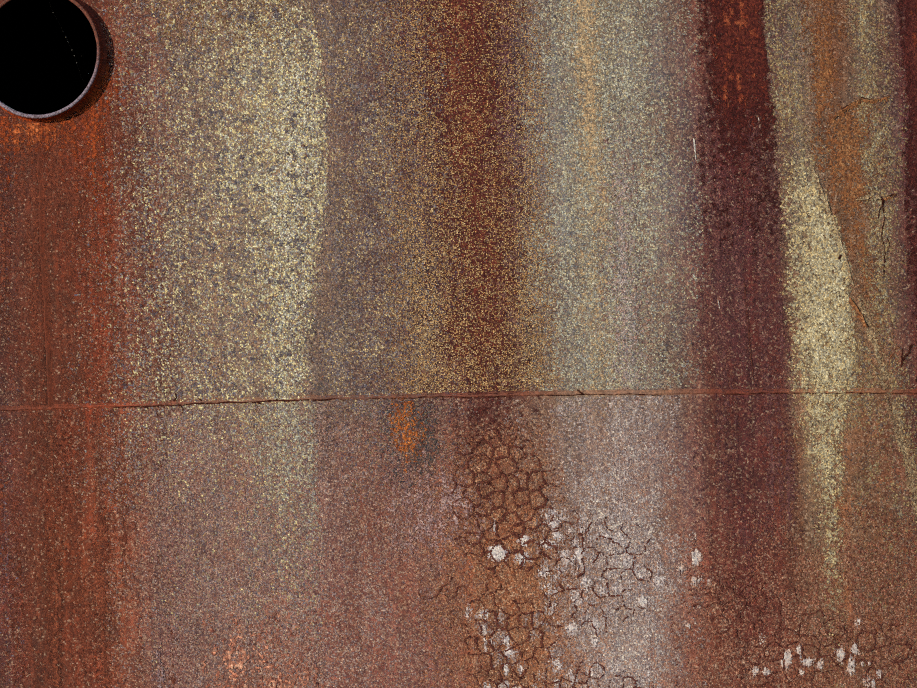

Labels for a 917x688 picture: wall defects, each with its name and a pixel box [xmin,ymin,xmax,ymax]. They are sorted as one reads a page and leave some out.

rust [0,30,184,688]
rust [201,613,325,688]
rust [374,0,589,688]
crack [418,426,667,688]
leakage [501,0,711,688]
rust [670,0,917,688]
crack [691,575,917,688]
leakage [763,0,917,688]